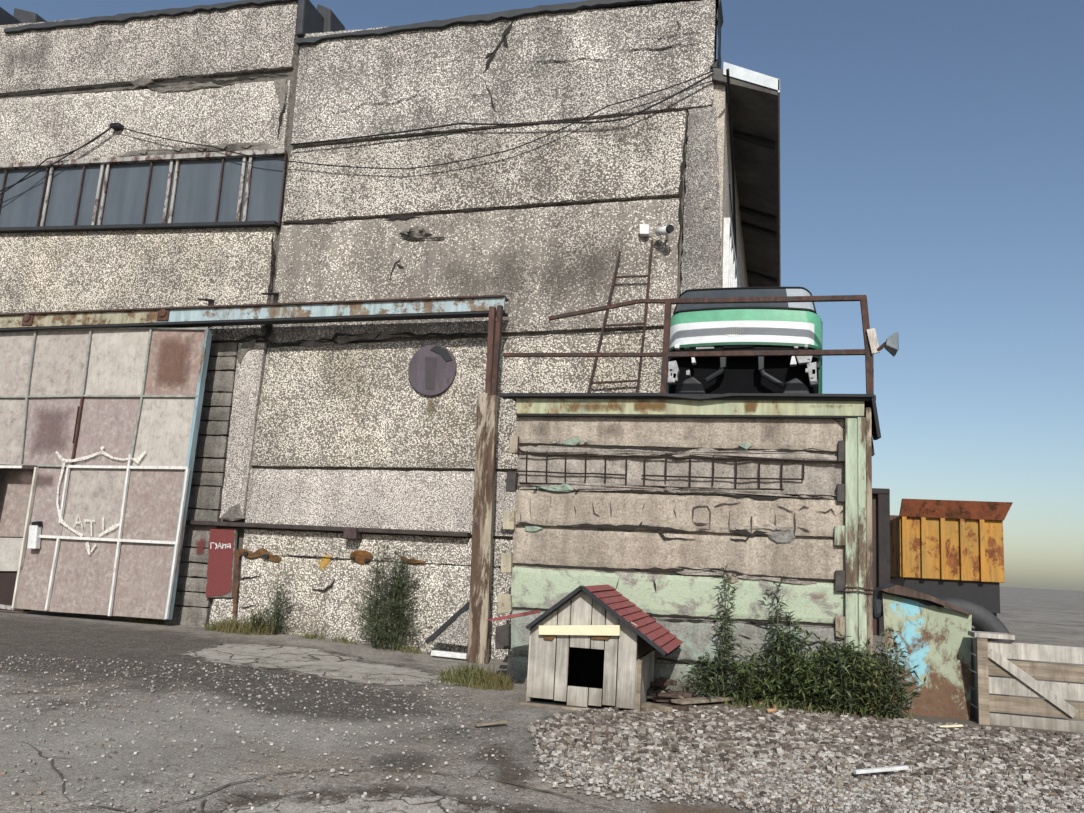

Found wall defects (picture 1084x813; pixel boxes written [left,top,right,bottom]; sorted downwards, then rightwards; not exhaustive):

crack [536,20,710,62]
crack [473,18,514,112]
rust [159,341,187,382]
rust [635,401,665,410]
rust [350,550,373,564]